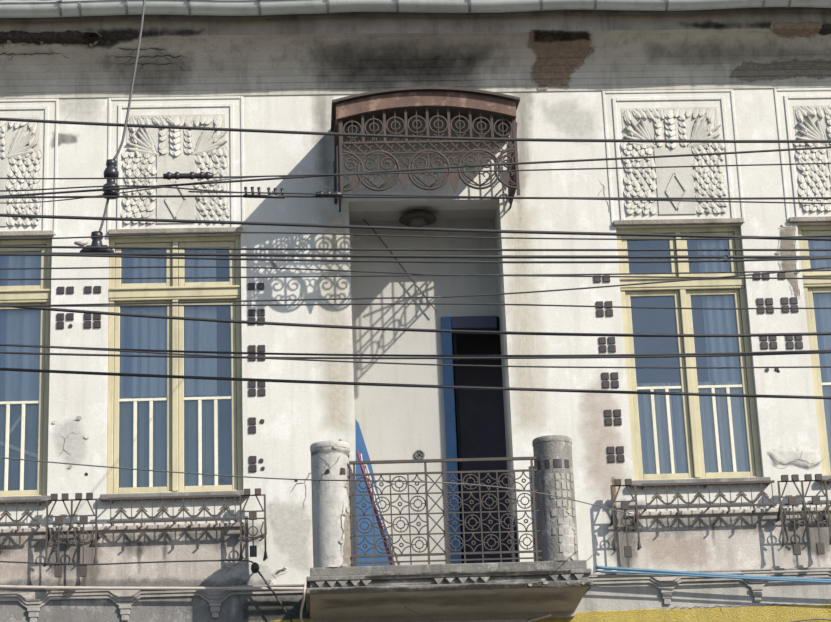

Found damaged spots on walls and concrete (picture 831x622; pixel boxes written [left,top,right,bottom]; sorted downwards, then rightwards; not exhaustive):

flaking render [0,28,102,48]
flaking render [770,20,831,39]
crack [0,52,68,60]
crack [105,48,184,70]
flaking render [528,28,595,91]
flaking render [730,57,831,82]
flaking render [776,225,802,299]
leakage [50,534,94,585]